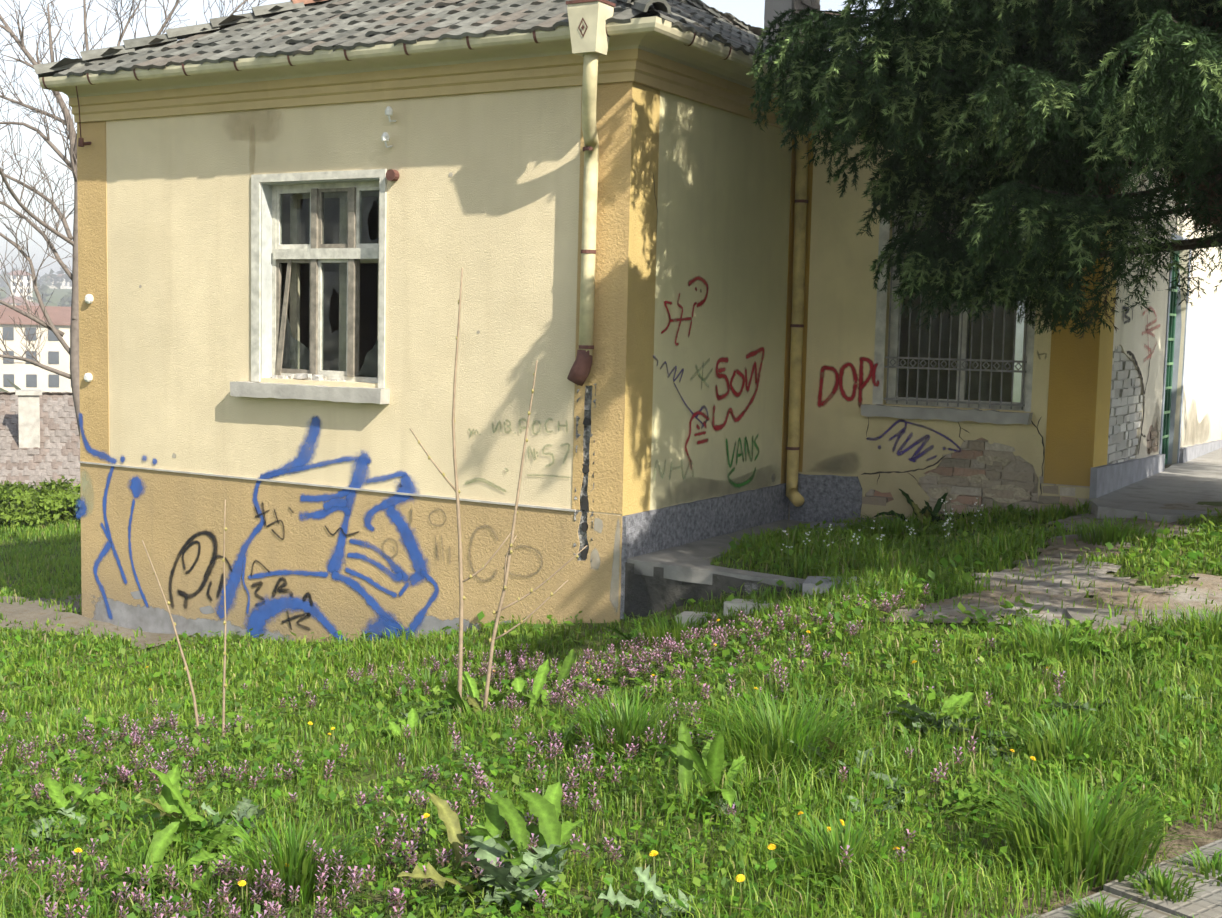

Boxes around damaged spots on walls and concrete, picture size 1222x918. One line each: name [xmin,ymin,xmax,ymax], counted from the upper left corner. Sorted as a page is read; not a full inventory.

spalling [1107,344,1160,465]
spalling [916,437,1090,520]